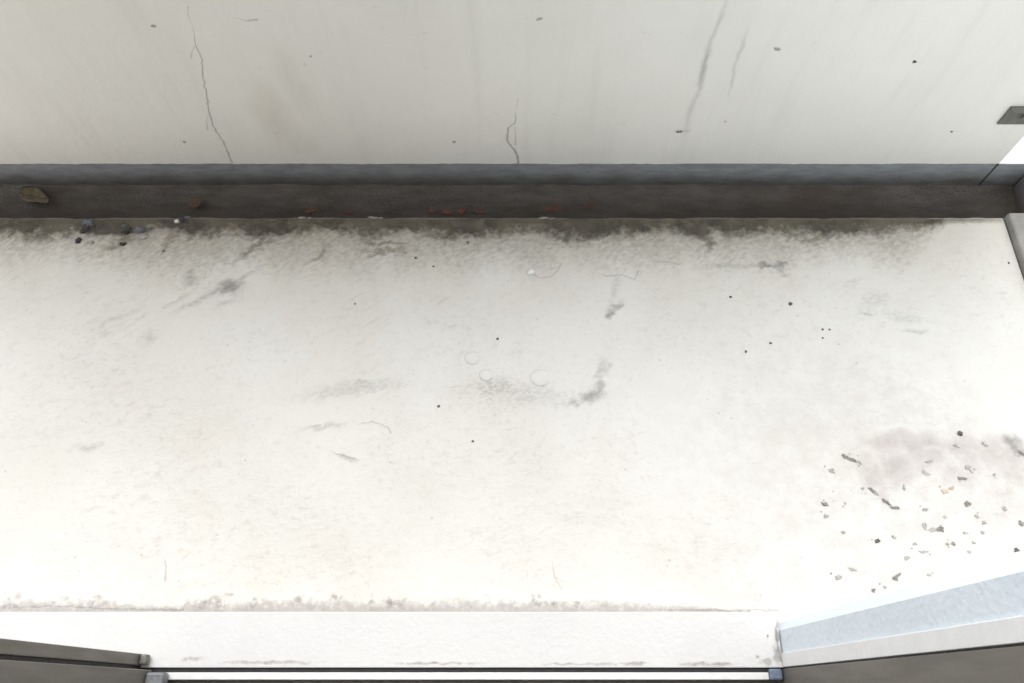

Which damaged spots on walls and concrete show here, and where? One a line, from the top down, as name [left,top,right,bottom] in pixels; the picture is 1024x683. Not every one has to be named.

water stain [0,219,942,242]
peeling [919,501,987,554]